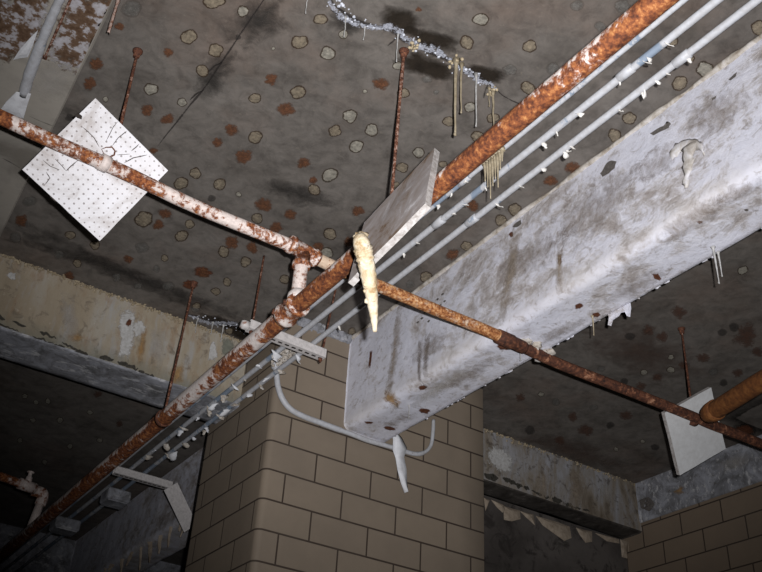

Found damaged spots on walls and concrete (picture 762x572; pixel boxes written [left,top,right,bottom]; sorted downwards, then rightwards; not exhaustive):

peeling [0,0,49,62]
peeling [47,0,120,75]
damp [384,9,457,79]
damp [467,66,502,82]
corrosion [277,103,296,116]
peeling [660,139,705,188]
corrosion [269,210,297,233]
peeling [118,310,146,357]